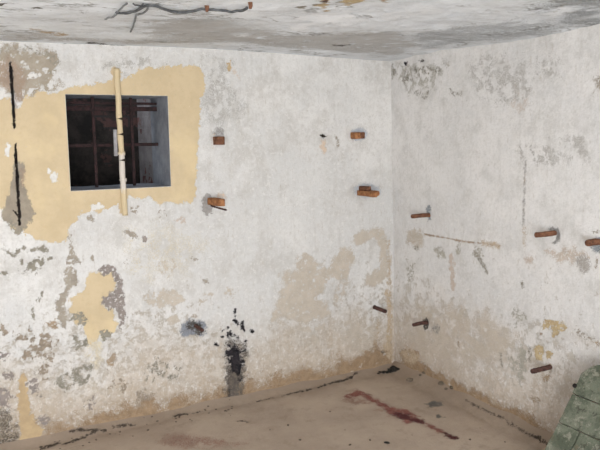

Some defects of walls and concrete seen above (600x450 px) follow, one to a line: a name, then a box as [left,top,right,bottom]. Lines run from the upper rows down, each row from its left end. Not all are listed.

crack [8,61,22,226]
peeling [0,64,227,440]
damp [42,298,547,435]
rust [534,344,553,382]
rust [540,319,567,338]